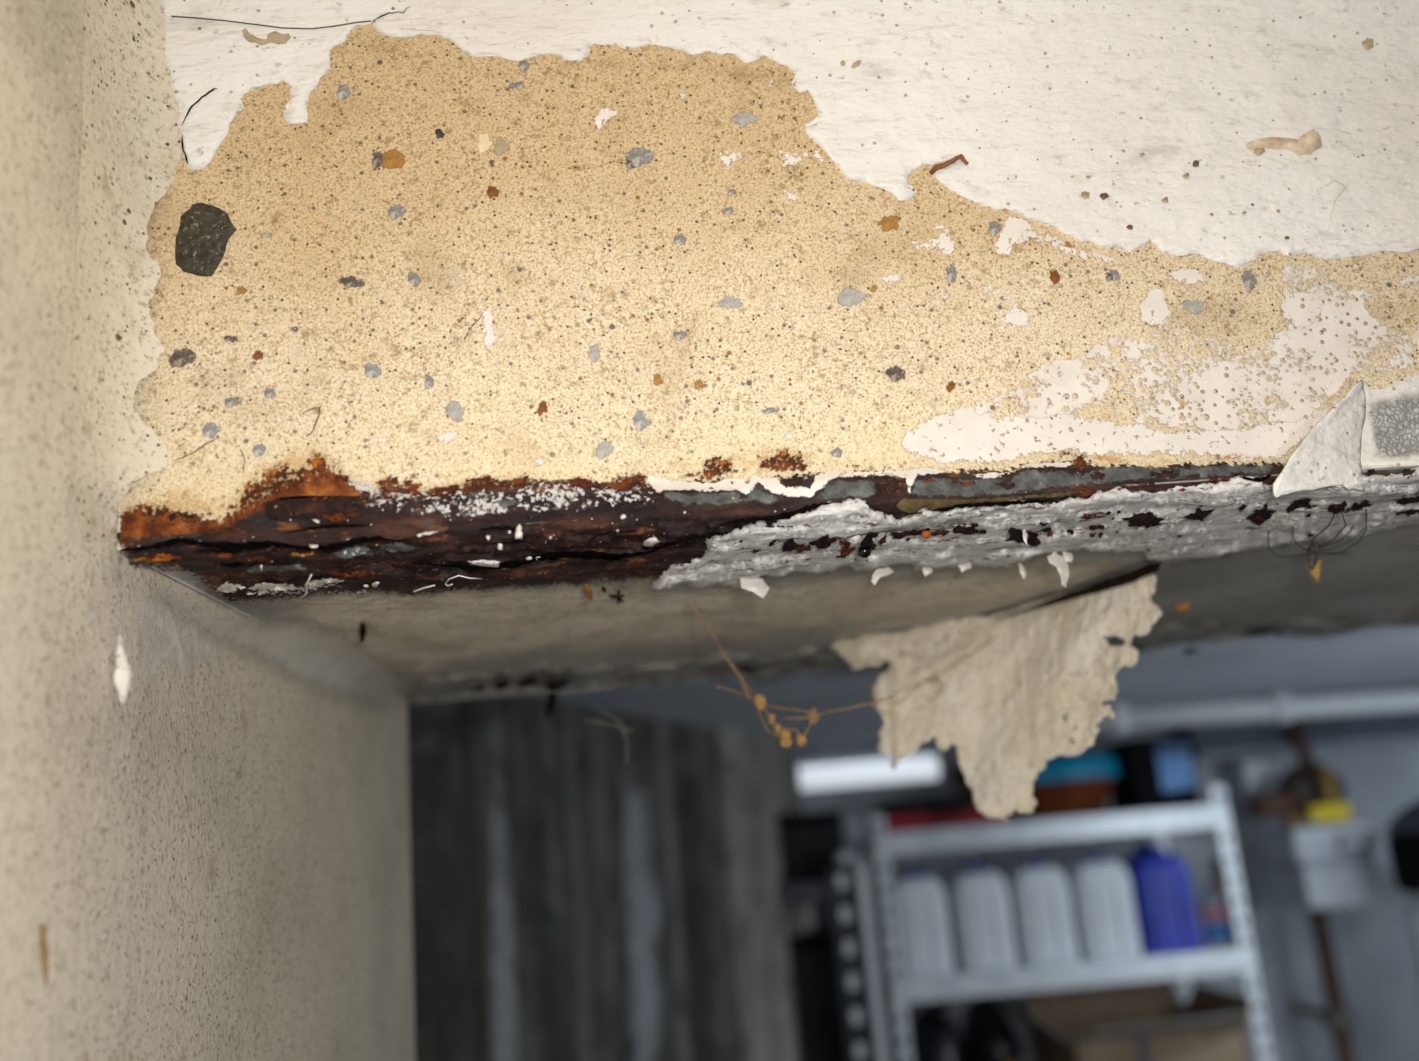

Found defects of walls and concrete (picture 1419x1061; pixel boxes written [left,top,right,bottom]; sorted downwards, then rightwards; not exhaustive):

corrosion [116,448,1286,605]
peeling [120,22,1419,822]